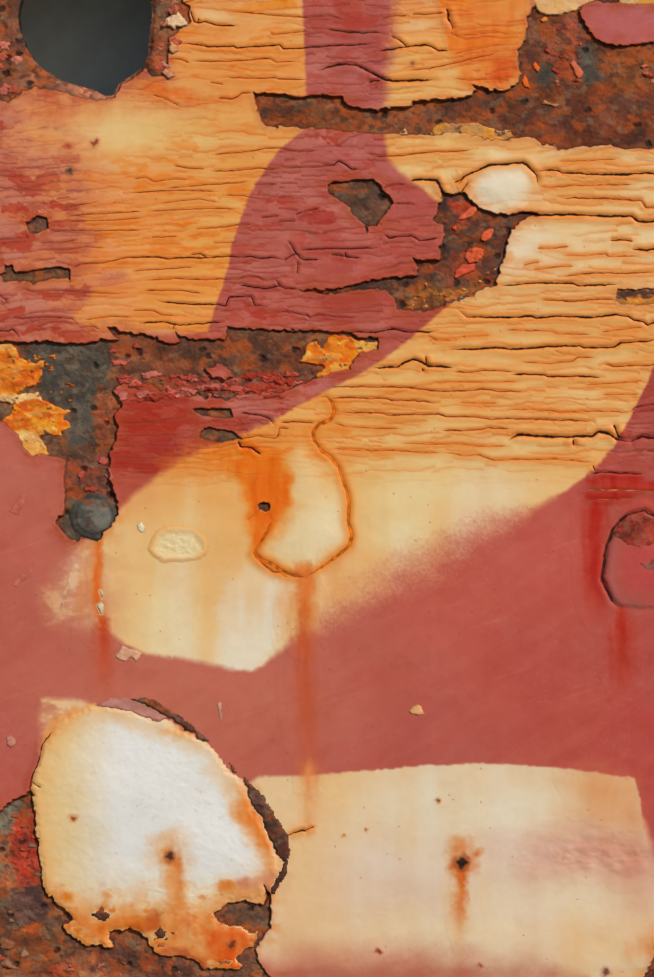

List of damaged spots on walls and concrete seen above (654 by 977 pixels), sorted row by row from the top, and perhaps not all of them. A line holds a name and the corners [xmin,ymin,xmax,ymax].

corrosion [0,0,654,177]
crack [170,0,504,99]
peeling [534,0,594,16]
corrosion [328,180,393,229]
corrosion [305,192,538,312]
crack [0,147,654,605]
corrosion [0,328,378,758]
corrosion [0,537,448,977]
corrosion [504,754,654,899]
corrosion [441,827,486,957]
corrosion [599,965,613,977]
corrosion [618,933,654,977]